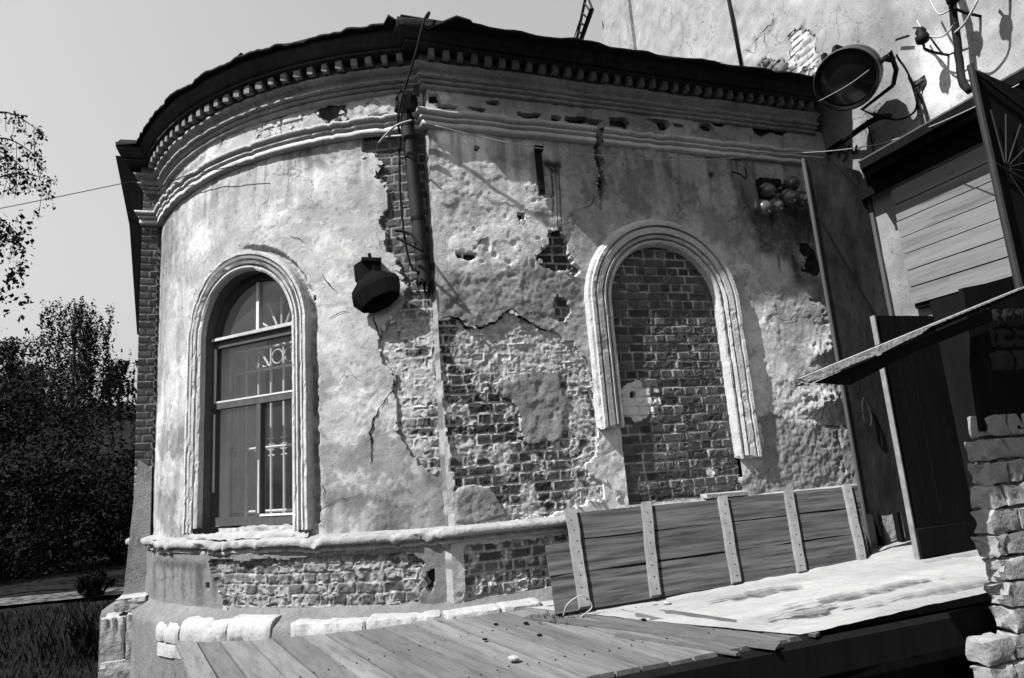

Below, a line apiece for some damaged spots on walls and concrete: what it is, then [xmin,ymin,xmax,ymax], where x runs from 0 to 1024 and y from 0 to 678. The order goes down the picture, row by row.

spalling [760,28,820,76]
spalling [317,105,348,123]
spalling [799,243,820,276]
spalling [361,136,620,520]
crack [365,379,395,463]
spalling [213,552,435,610]
spalling [464,535,569,601]